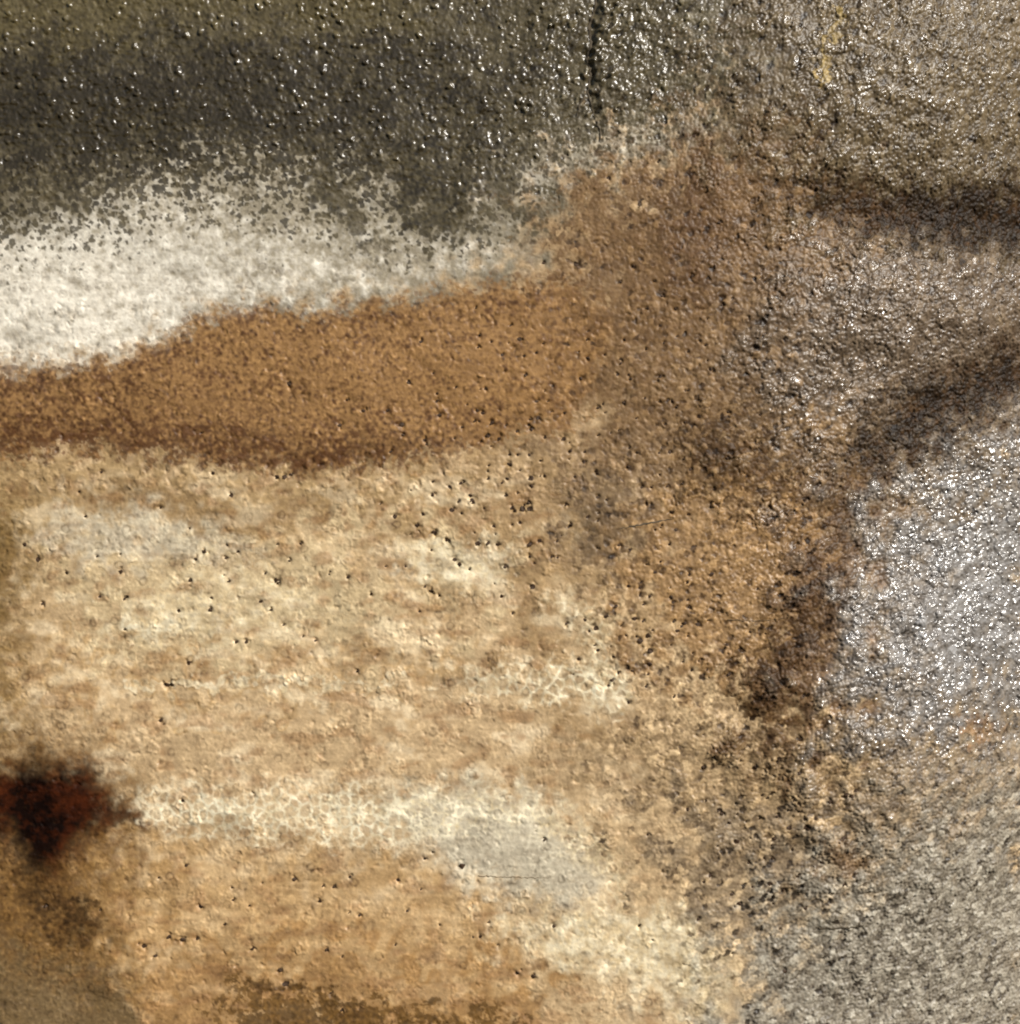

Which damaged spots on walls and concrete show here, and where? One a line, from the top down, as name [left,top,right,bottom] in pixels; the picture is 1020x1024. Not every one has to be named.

leakage [0,0,1020,801]
rust [0,736,152,953]